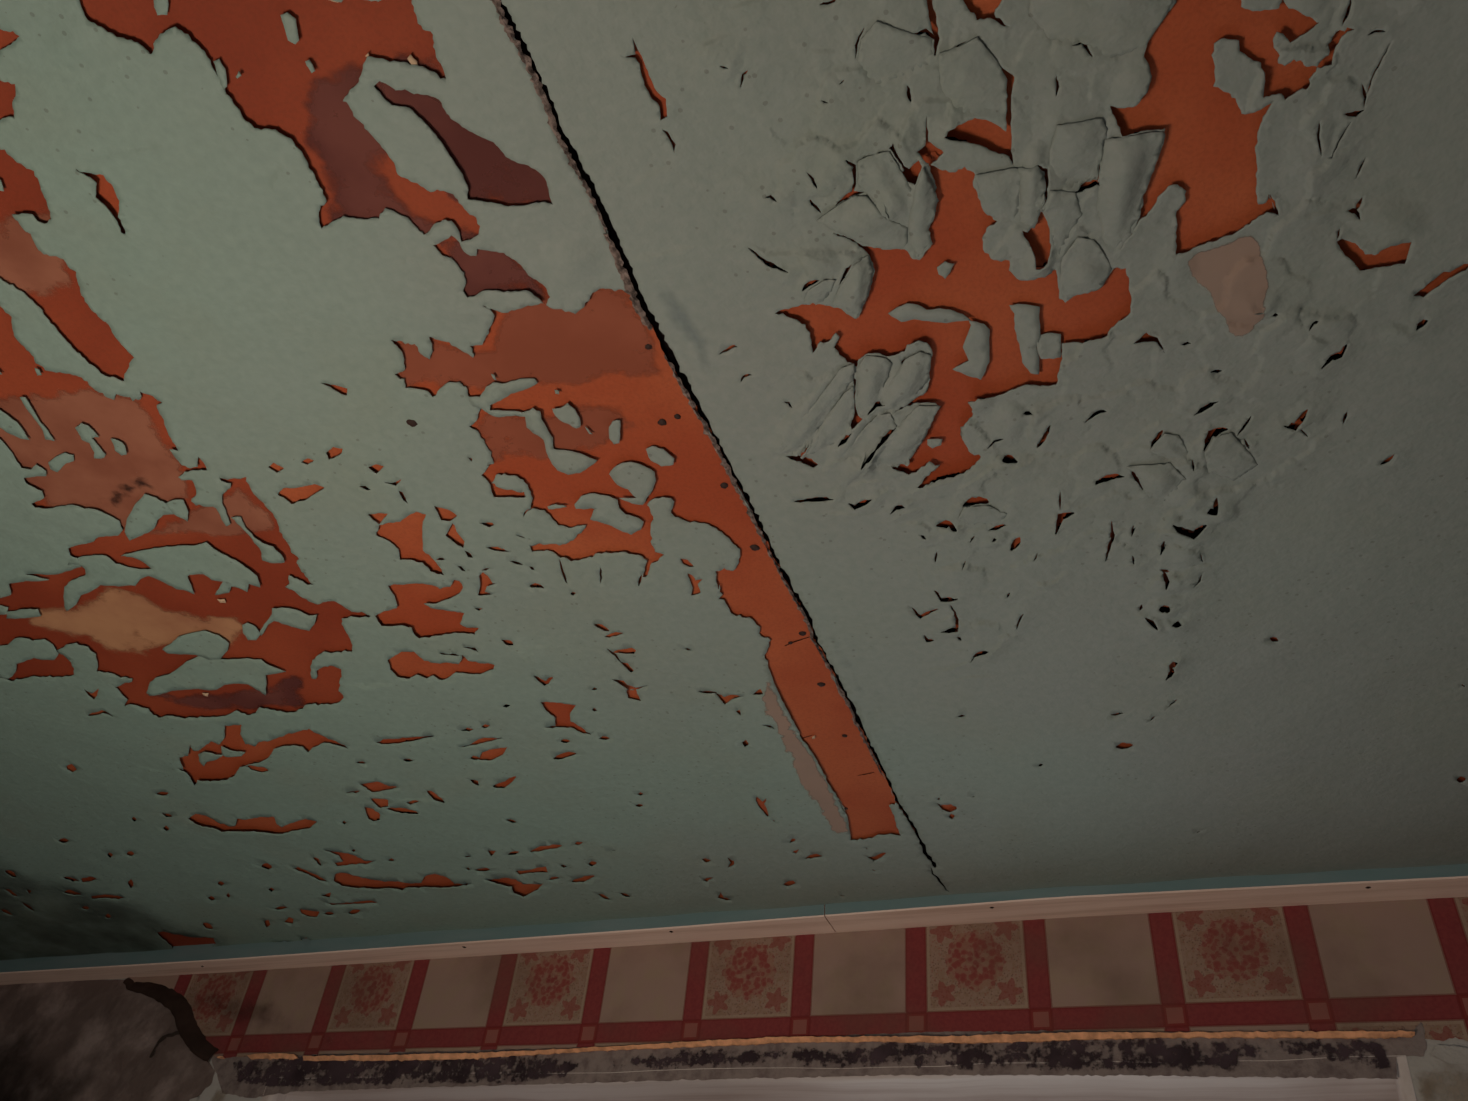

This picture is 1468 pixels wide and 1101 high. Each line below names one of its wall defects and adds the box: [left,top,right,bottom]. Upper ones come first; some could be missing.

peeling [0,81,16,120]
peeling [80,0,446,228]
peeling [627,40,676,149]
peeling [0,150,50,233]
peeling [76,169,125,234]
peeling [368,153,534,259]
peeling [776,0,1353,487]
peeling [1337,230,1411,270]
crack [491,0,948,891]
peeling [1097,419,1258,501]
peeling [0,259,915,871]
crack [149,1031,179,1058]